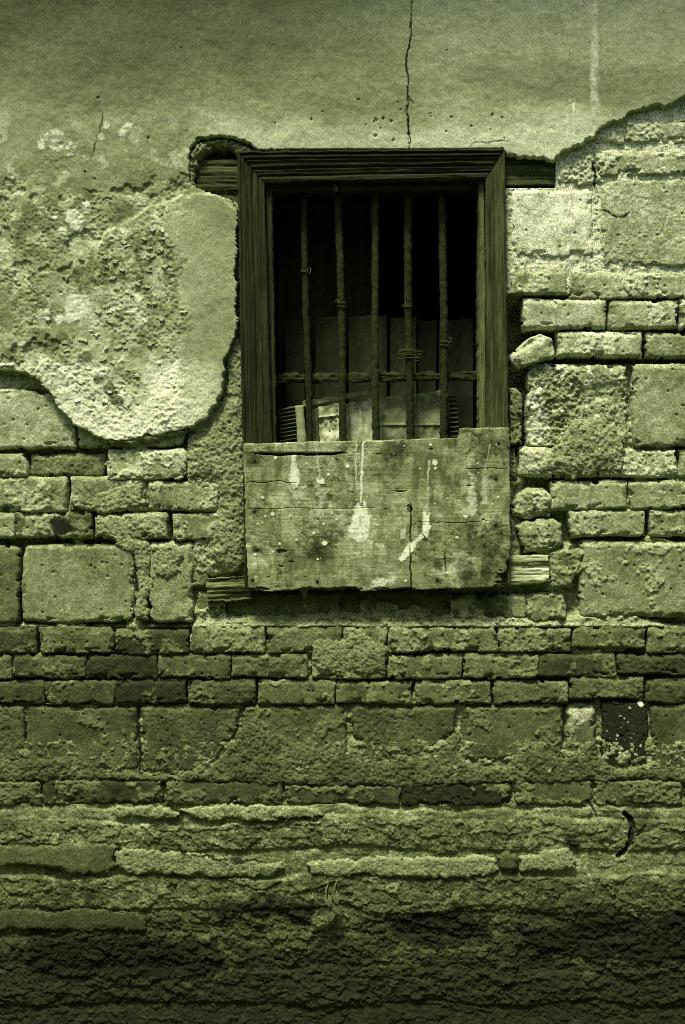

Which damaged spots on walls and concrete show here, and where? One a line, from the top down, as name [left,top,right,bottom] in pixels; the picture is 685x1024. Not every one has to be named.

crack [405,0,414,150]
spalling [189,138,255,189]
flaking render [120,228,175,296]
spalling [508,334,555,371]
spalling [510,486,584,623]